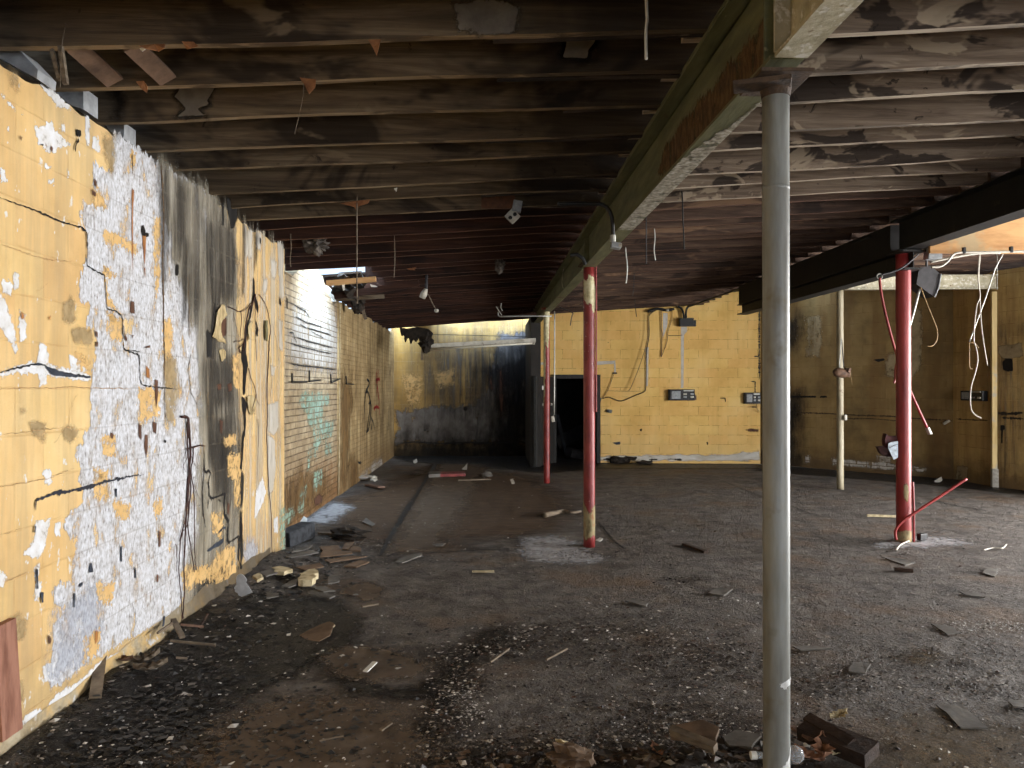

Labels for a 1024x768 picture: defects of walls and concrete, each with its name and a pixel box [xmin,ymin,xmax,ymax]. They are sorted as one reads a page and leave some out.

peeling [40,82,71,111]
peeling [263,241,288,309]
crack [0,199,259,469]
peeling [0,116,283,725]
leakage [160,164,258,592]
leakage [400,346,525,414]
crack [0,470,144,509]
peeling [274,450,322,533]